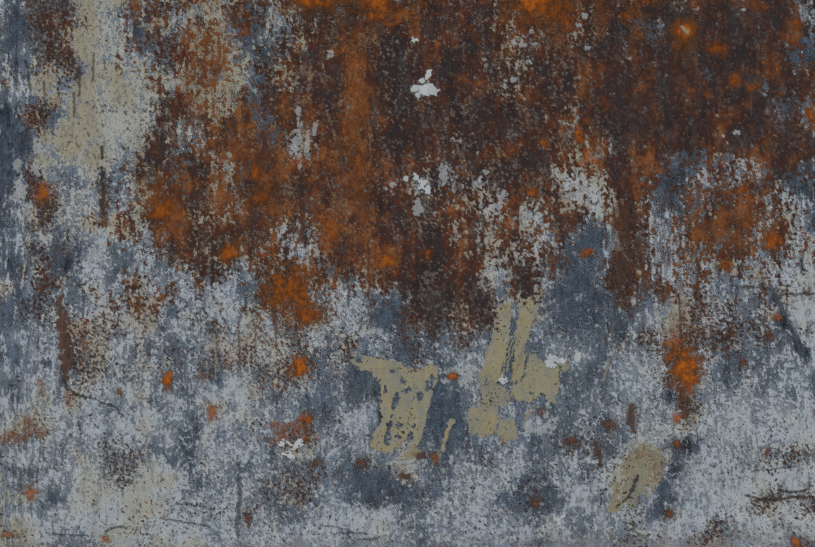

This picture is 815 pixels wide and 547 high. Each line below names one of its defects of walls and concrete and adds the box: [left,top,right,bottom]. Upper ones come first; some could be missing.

peeling [405,53,440,104]
peeling [473,0,608,122]